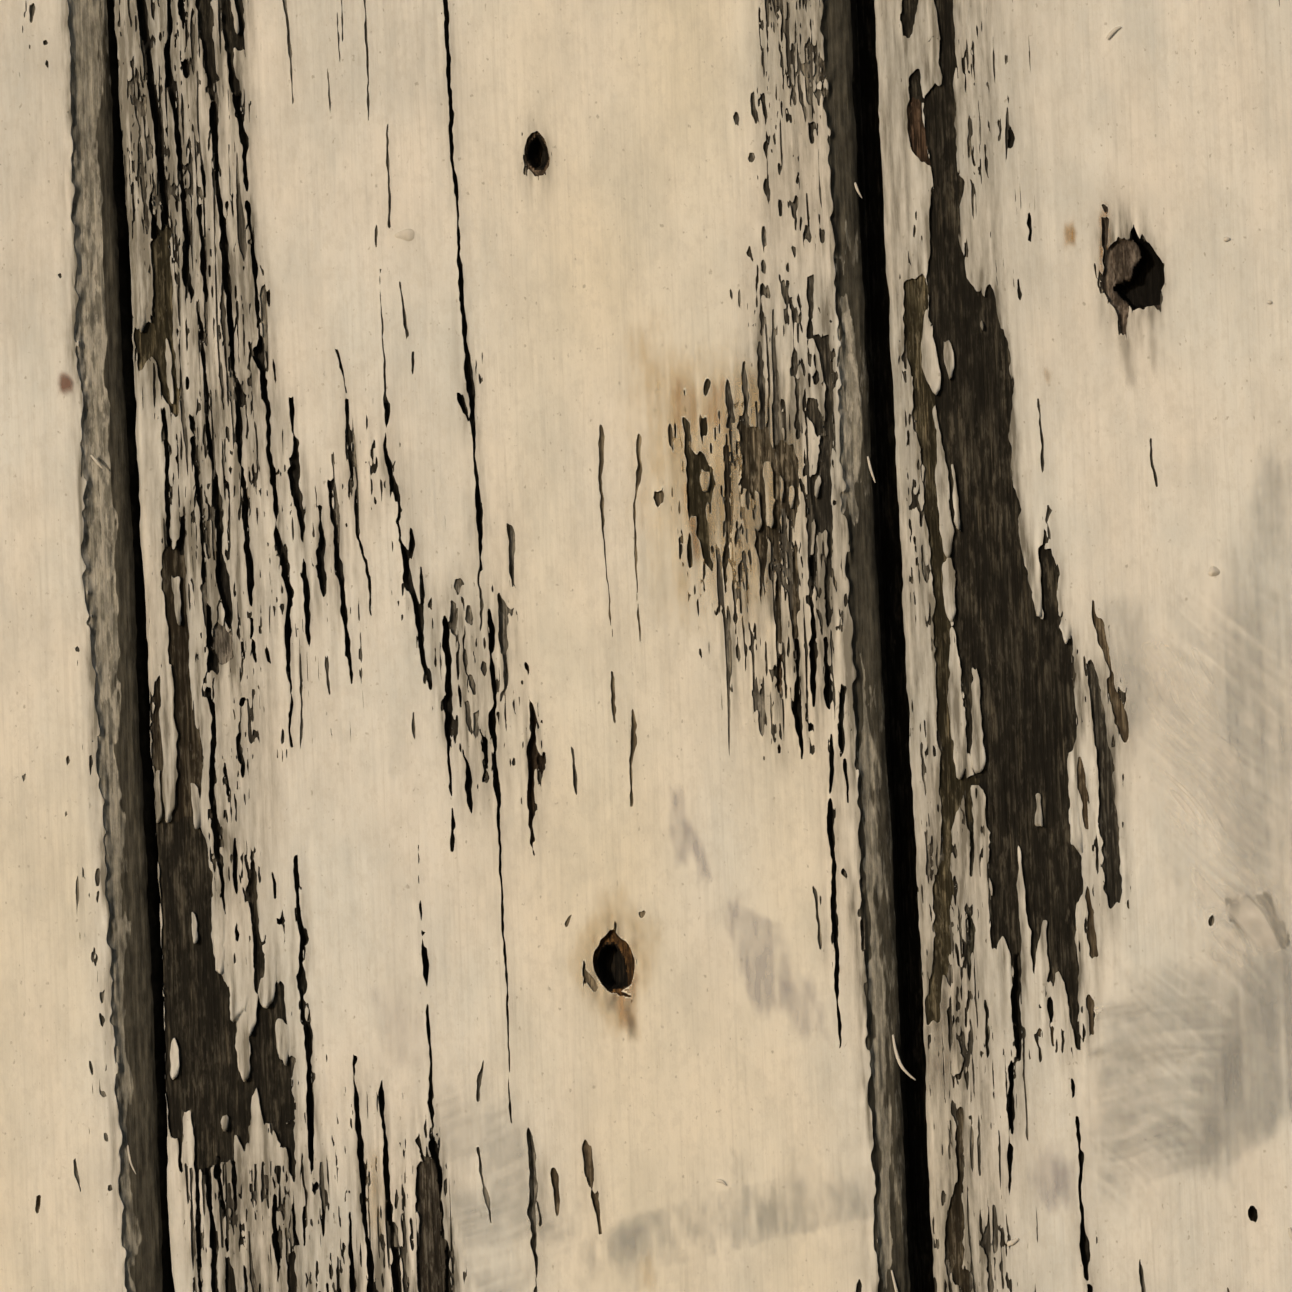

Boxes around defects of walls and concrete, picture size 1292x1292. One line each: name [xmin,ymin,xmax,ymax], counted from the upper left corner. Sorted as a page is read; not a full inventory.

peeling [114,0,467,1292]
crack [124,0,577,1292]
peeling [441,578,543,788]
peeling [662,0,852,760]
peeling [898,0,1131,1292]
peeling [550,1167,560,1216]
peeling [582,1140,602,1234]